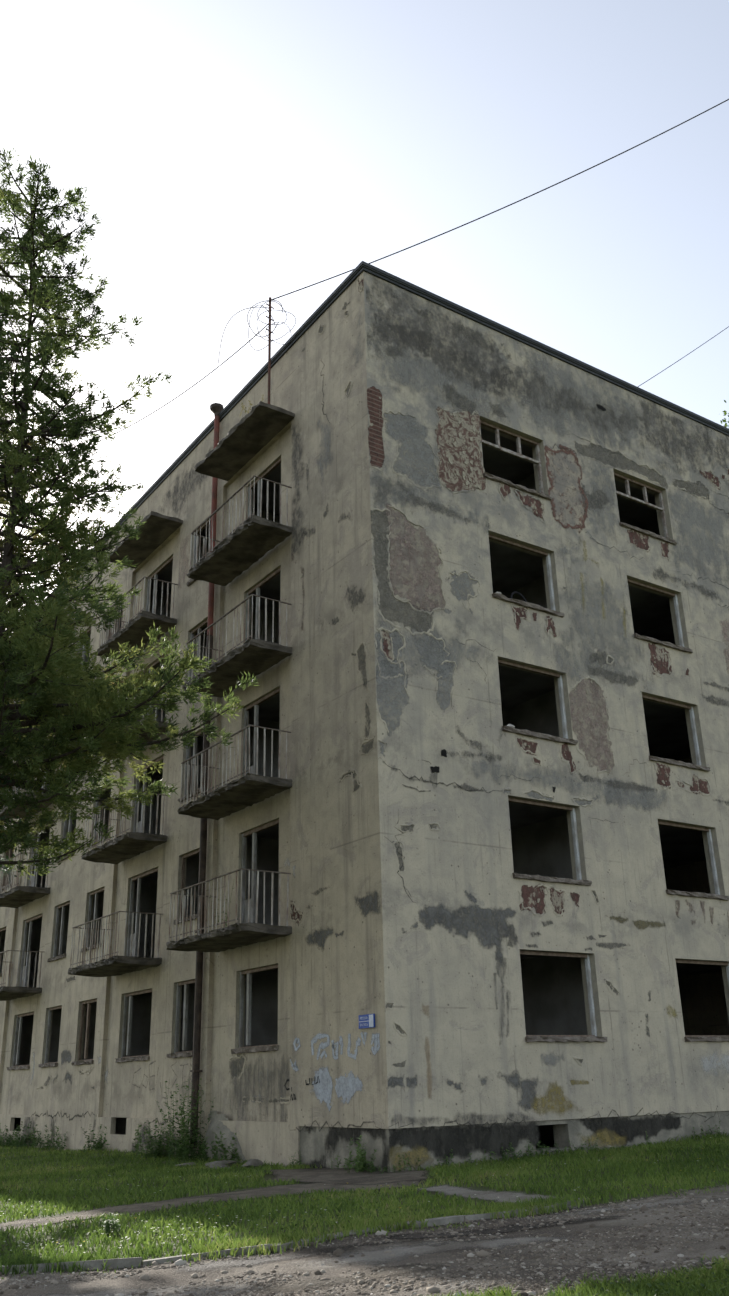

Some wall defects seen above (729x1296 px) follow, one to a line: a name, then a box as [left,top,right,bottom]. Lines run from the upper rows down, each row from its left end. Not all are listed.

peeling [344,380,729,533]
peeling [625,528,669,560]
peeling [510,603,557,637]
peeling [340,504,481,793]
peeling [648,643,689,678]
peeling [560,676,616,774]
peeling [517,737,541,766]
peeling [518,883,600,917]
damp [403,891,553,1008]
damp [299,1073,539,1172]
damp [581,1115,681,1146]